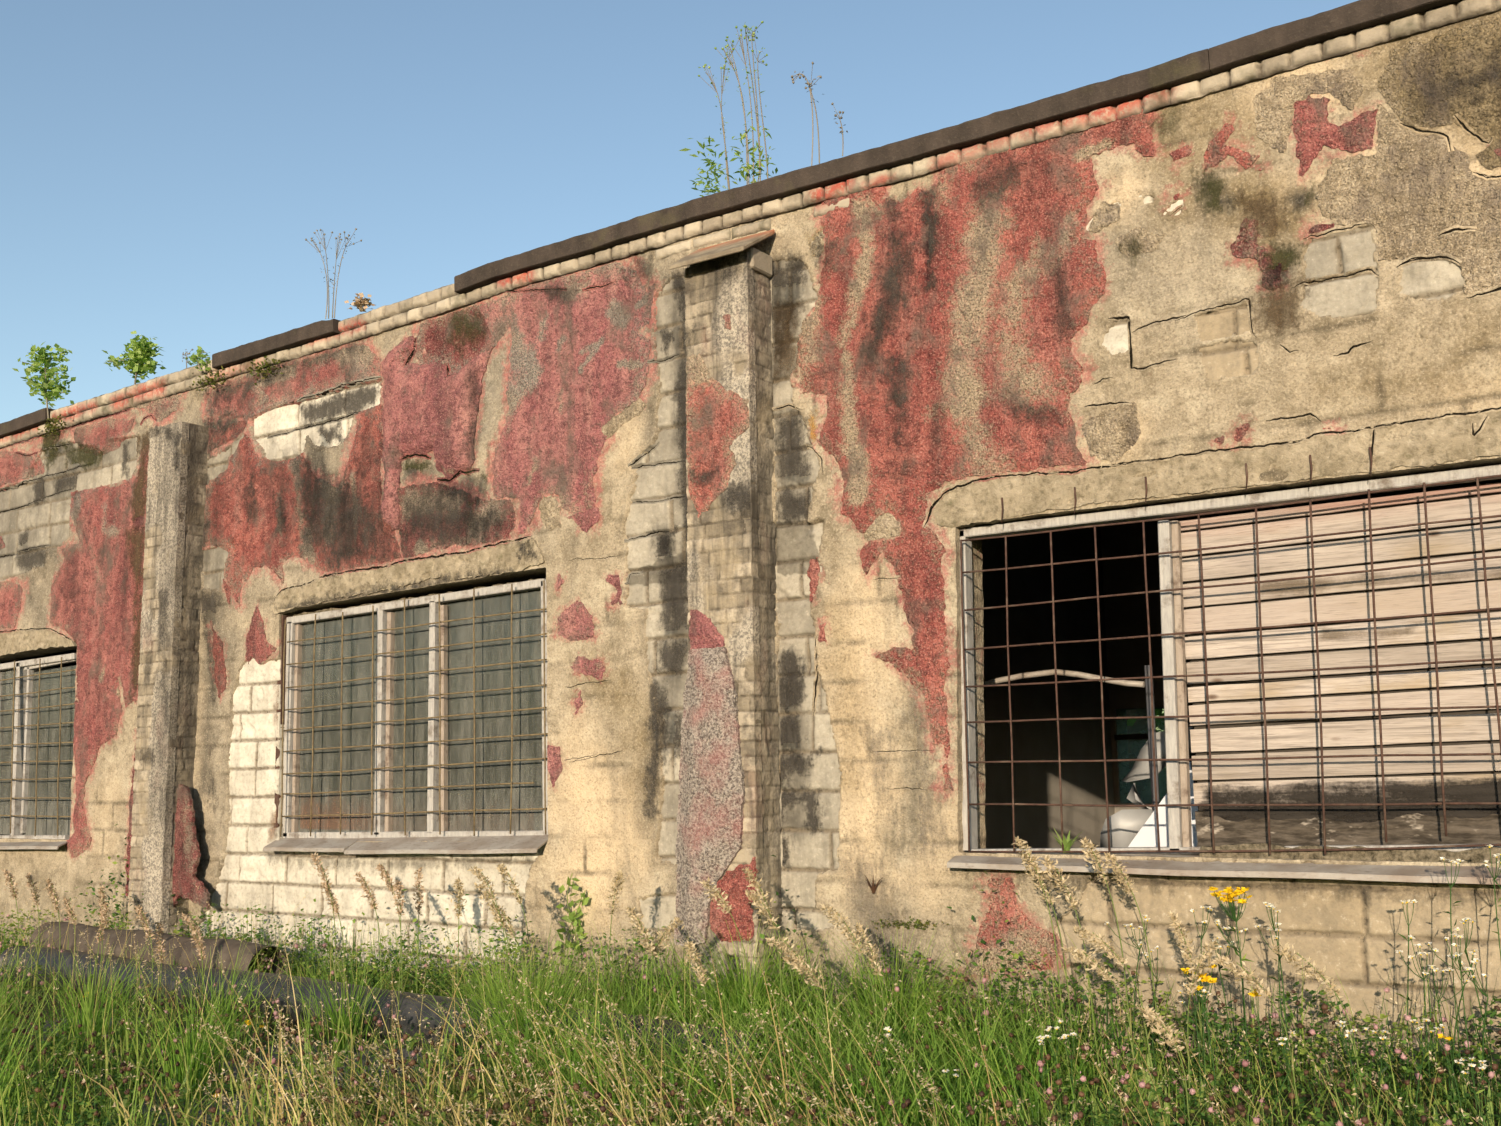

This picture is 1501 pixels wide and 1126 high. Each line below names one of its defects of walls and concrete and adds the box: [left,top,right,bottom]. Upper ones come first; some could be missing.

crack [1399,113,1501,181]
water stain [645,266,716,817]
water stain [727,485,751,514]
water stain [776,414,810,522]
flaking render [770,13,1501,930]
crack [922,404,1501,528]
spalling [172,262,749,974]
water stain [778,650,822,833]
flaking render [710,857,759,942]